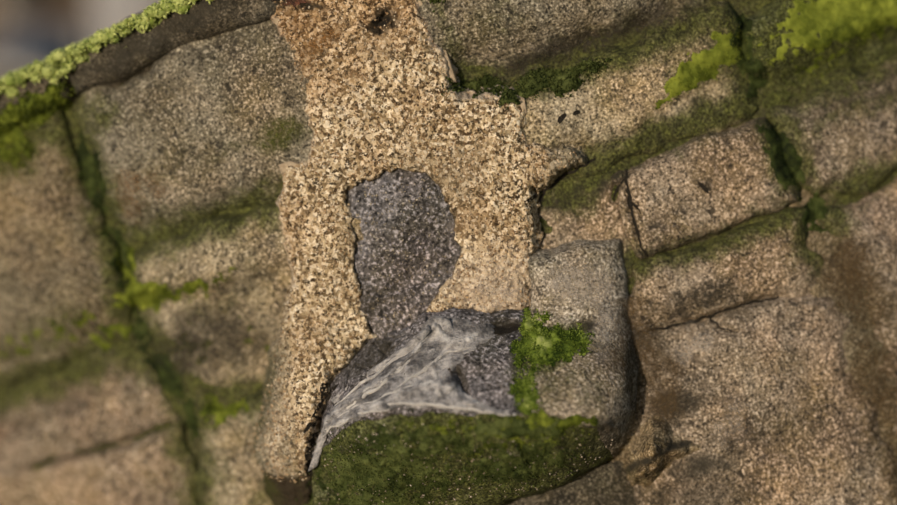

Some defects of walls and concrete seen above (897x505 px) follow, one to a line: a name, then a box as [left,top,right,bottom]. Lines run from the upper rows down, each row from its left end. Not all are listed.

spalling [249,0,588,505]